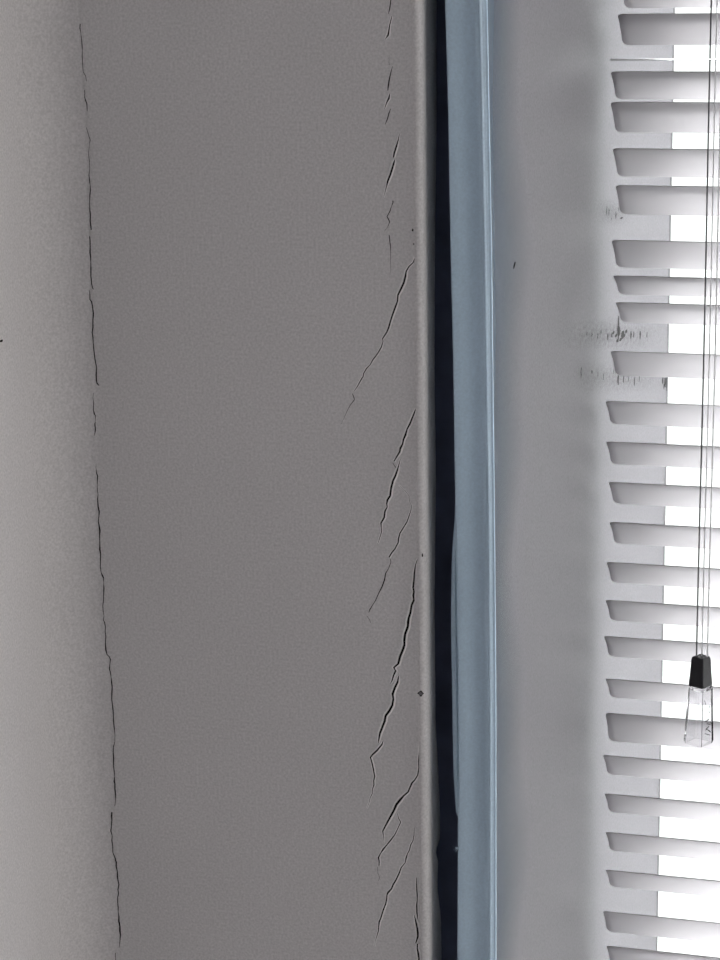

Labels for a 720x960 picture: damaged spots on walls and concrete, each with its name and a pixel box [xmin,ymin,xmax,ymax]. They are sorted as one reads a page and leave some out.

crack [385,0,393,39]
crack [86,127,99,436]
crack [345,64,414,415]
crack [96,470,121,960]
crack [366,408,421,960]